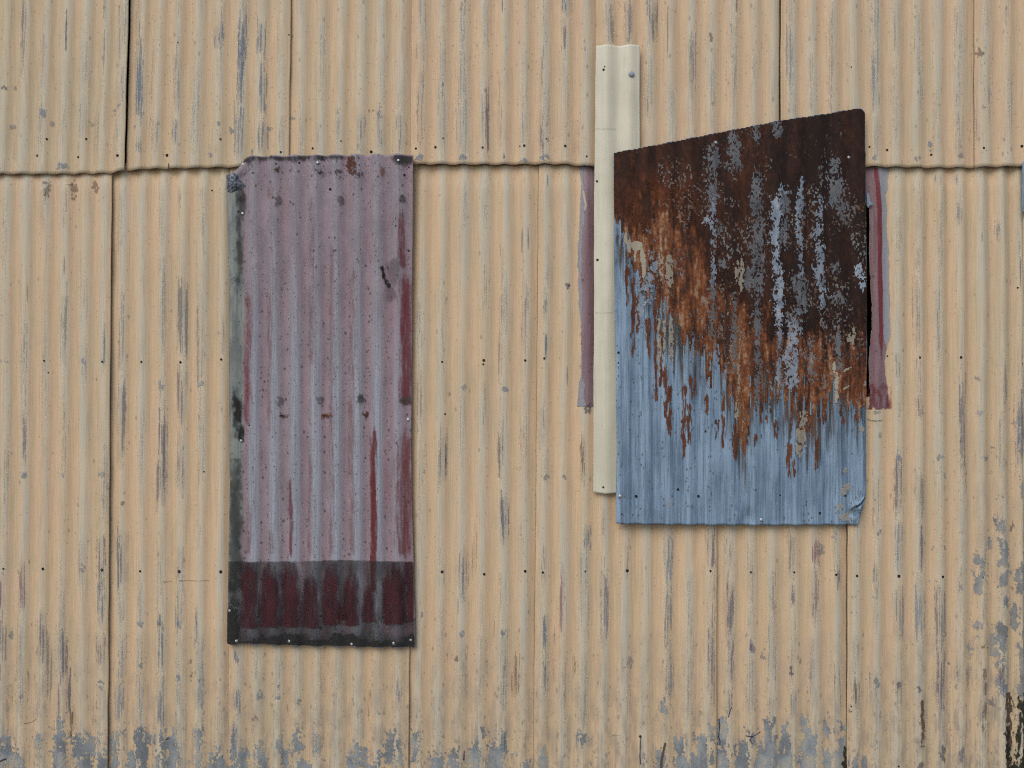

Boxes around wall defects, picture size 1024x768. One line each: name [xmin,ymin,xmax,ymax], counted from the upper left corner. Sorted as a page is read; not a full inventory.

peeling [701,141,730,345]
corrosion [614,109,867,479]
peeling [729,151,854,407]
peeling [1012,415,1024,456]
peeling [0,629,328,768]
peeling [642,575,876,768]
peeling [958,514,1024,704]